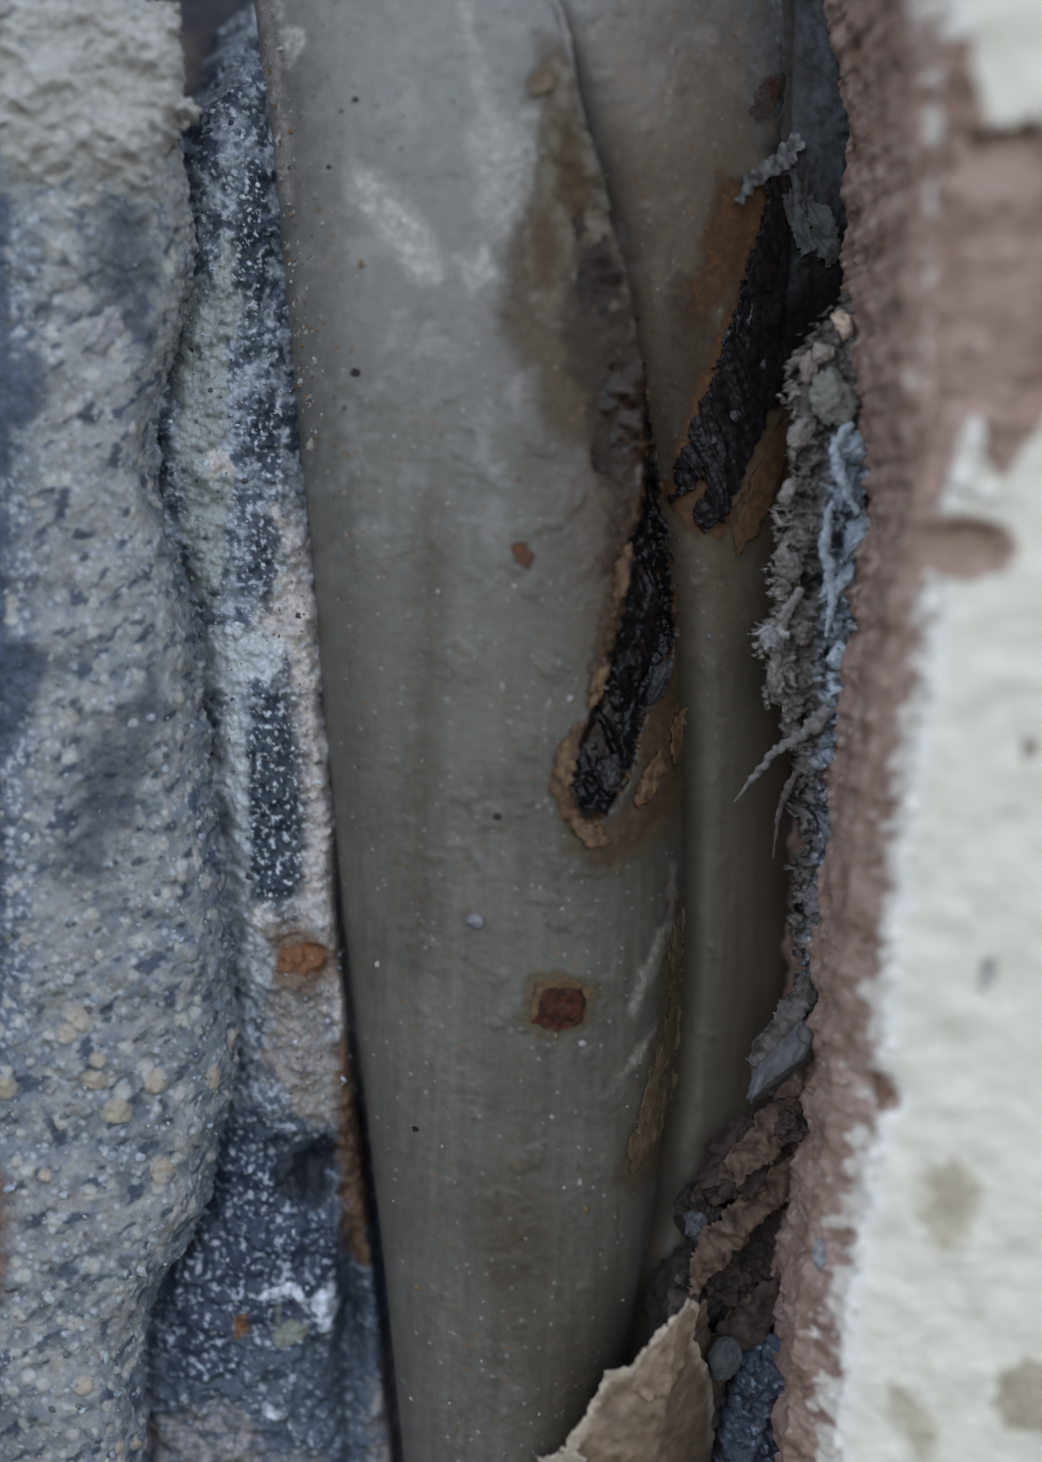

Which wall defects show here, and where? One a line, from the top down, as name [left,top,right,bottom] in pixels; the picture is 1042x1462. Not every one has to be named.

rust [512,543,534,569]
rust [274,929,337,991]
rust [520,971,599,1040]
spalling [872,1069,901,1114]
peeling [537,1297,715,1462]